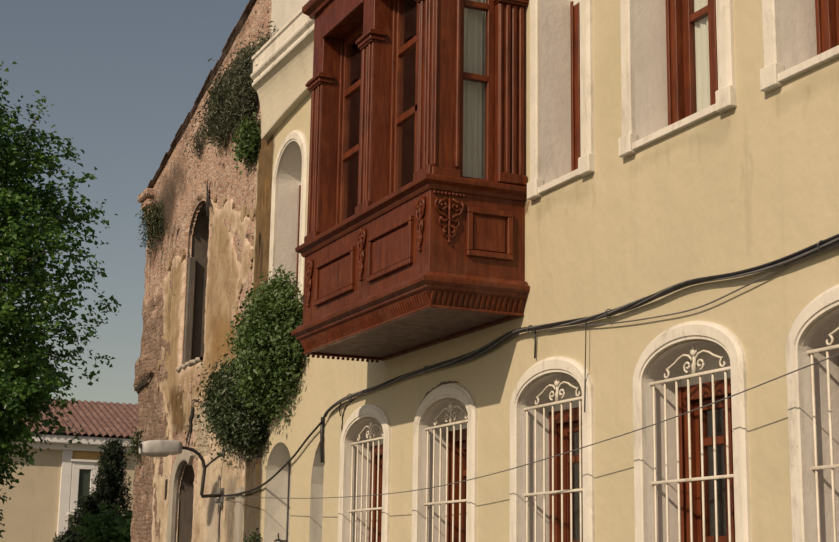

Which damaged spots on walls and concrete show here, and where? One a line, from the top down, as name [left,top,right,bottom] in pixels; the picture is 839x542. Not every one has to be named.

spalling [130,0,272,542]